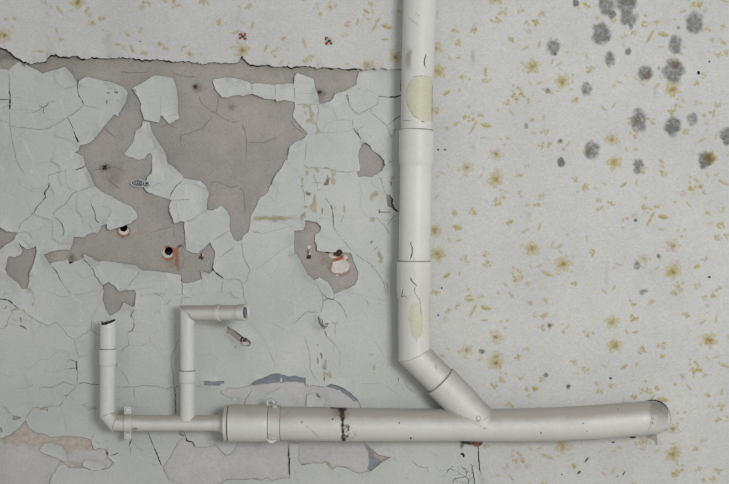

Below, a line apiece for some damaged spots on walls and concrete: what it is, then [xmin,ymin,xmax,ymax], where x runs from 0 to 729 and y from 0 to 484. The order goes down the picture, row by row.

leakage [594,24,610,43]
leakage [600,0,635,28]
leakage [670,14,702,53]
leakage [666,119,680,134]
crack [0,78,111,240]
peeling [0,49,363,298]
crack [294,83,401,292]
peeling [353,138,399,222]
peeling [98,278,140,320]
crack [0,256,103,433]
crack [93,431,167,476]
peeling [159,431,395,484]